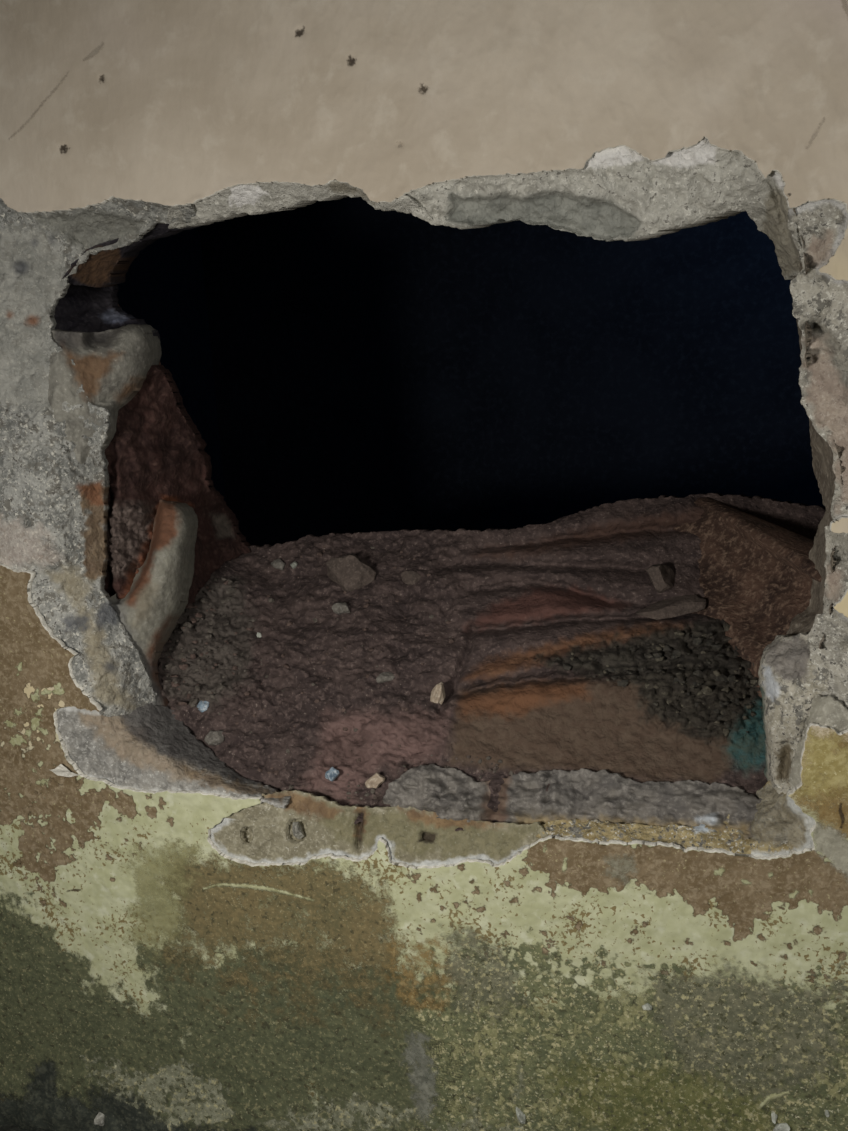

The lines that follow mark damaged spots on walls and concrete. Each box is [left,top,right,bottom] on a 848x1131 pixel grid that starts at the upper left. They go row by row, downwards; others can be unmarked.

spalling [0,138,848,946]
water stain [0,853,848,1131]
peeling [539,930,555,955]